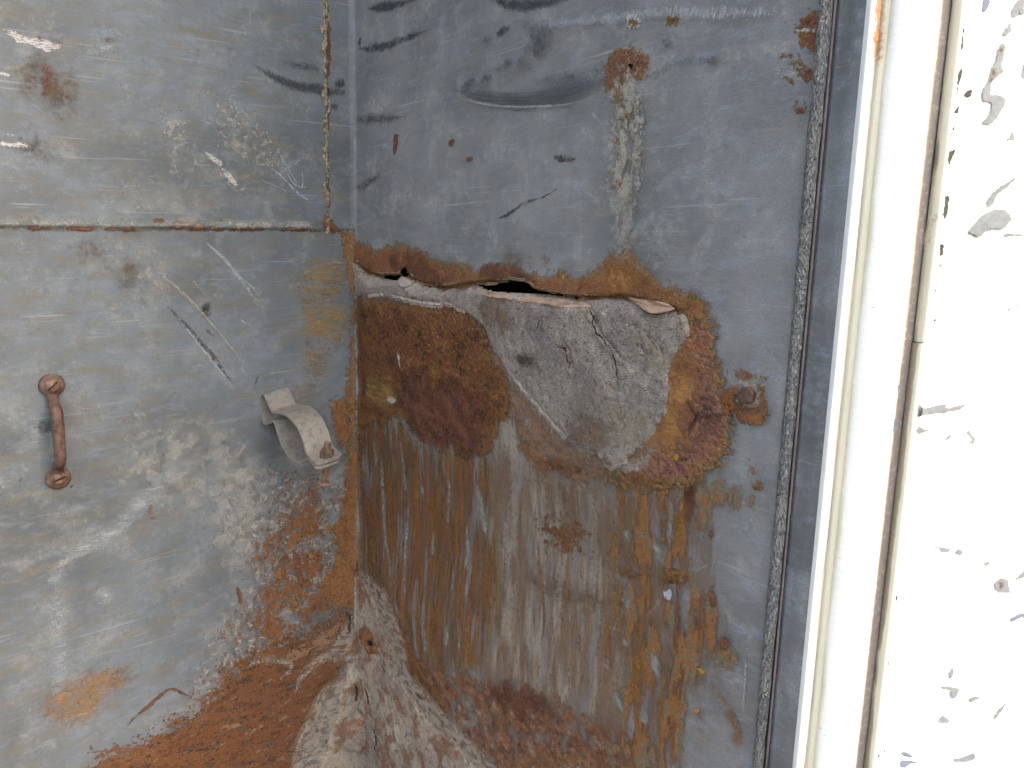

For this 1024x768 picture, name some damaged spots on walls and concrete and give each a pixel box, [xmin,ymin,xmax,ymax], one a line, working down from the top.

rust [602,44,650,93]
rust [780,8,818,86]
peeling [954,0,1024,125]
damp [604,65,647,254]
peeling [969,175,1023,238]
crack [371,270,659,382]
spalling [352,260,690,476]
rust [87,153,770,768]